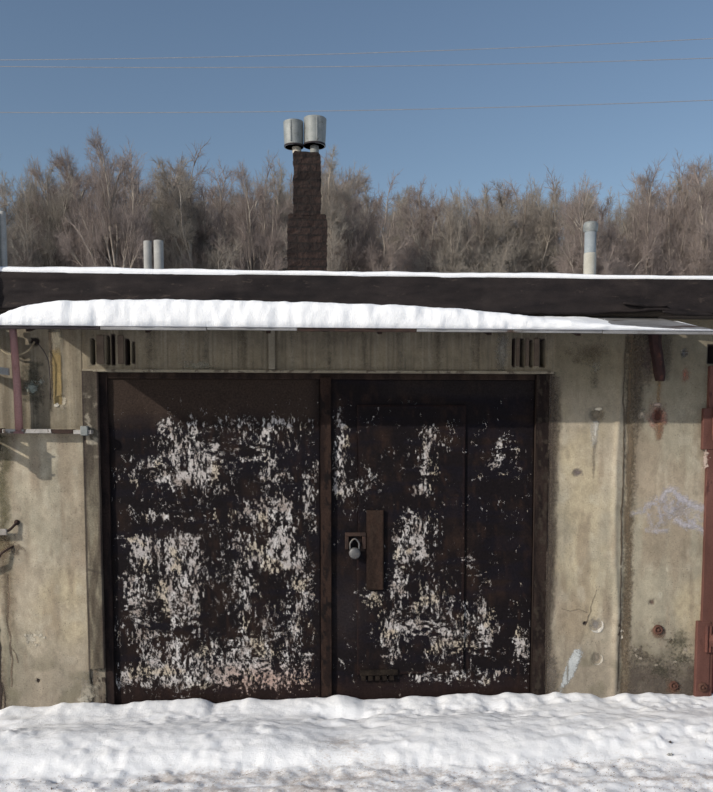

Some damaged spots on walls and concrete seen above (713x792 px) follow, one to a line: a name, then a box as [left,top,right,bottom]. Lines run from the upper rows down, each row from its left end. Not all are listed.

peeling [115,411,319,698]
peeling [332,414,383,497]
peeling [408,424,455,500]
peeling [354,508,529,686]
damp [544,374,560,694]
damp [631,334,653,432]